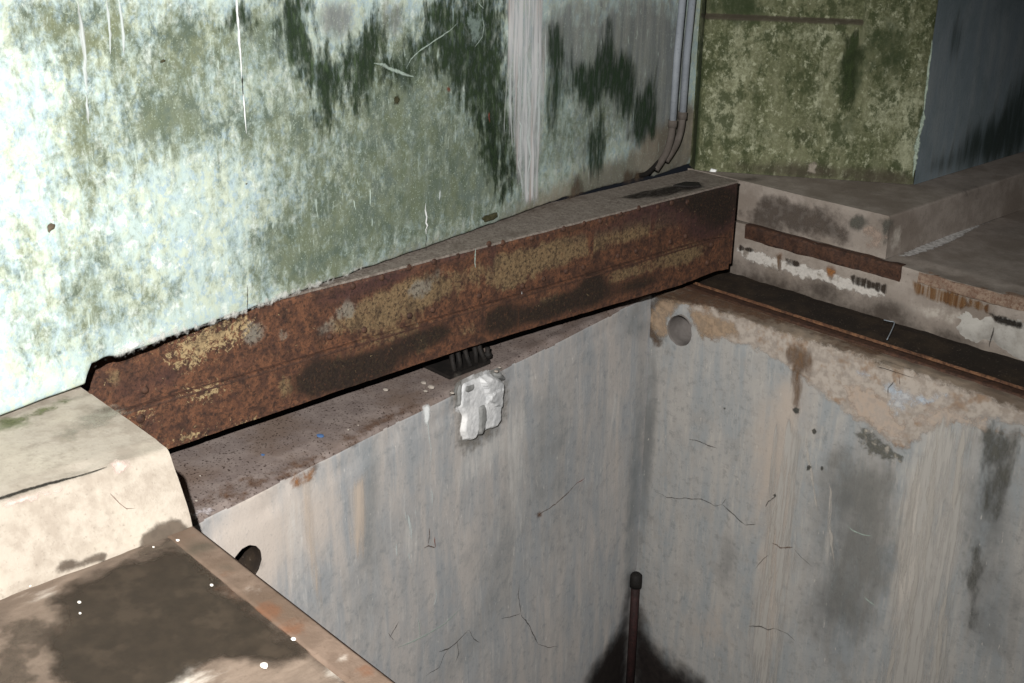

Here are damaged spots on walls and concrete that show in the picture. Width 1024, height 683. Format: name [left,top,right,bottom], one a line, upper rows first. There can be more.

damp [107,2,125,54]
damp [226,1,258,30]
damp [78,4,89,123]
damp [344,10,395,115]
damp [472,0,546,203]
rust [744,223,906,282]
rust [664,288,784,323]
spalling [119,325,197,354]
rust [786,348,811,403]
spalling [168,270,1024,683]
crack [659,493,776,525]
damp [0,520,307,683]